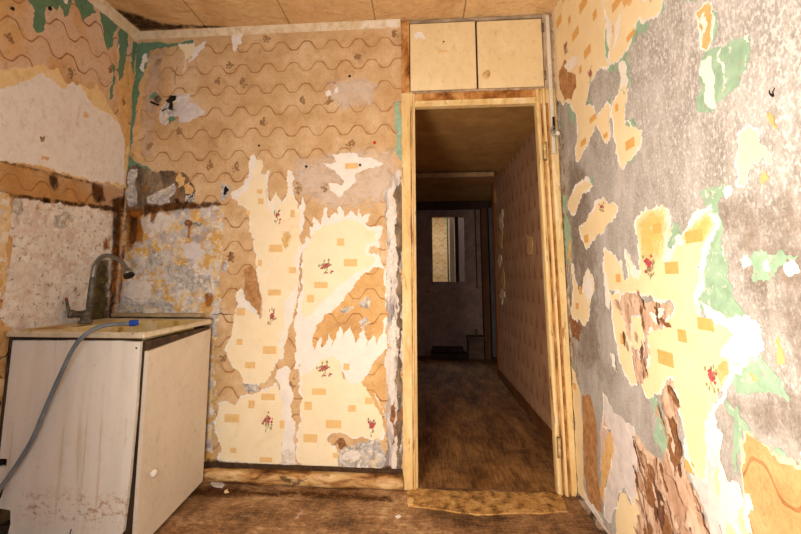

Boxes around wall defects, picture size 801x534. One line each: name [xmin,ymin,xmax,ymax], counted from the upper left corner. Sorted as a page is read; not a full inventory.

peeling [559,60,576,126]
peeling [608,83,643,170]
peeling [624,20,648,58]
peeling [696,10,751,113]
spalling [0,0,233,462]
peeling [280,100,403,474]
peeling [562,195,573,266]
peeling [698,183,748,319]
peeling [740,249,800,283]
peeling [569,314,582,342]
peeling [732,329,790,403]
spalling [0,509,10,534]